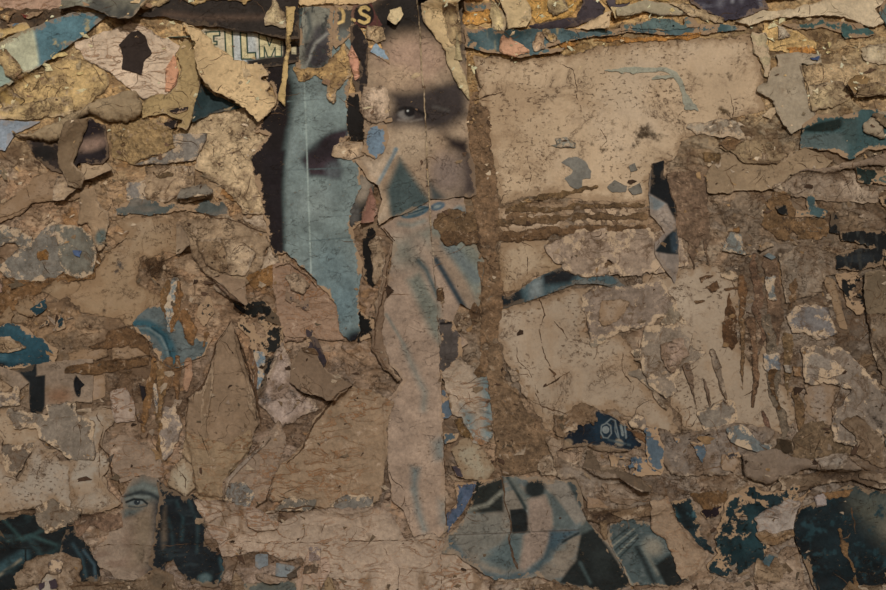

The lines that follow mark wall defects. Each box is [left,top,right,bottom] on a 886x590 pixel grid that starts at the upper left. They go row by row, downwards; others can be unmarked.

peeling [59,0,170,19]
peeling [182,0,296,122]
peeling [365,7,403,44]
peeling [421,0,768,293]
peeling [0,90,190,327]
flaking render [0,372,122,515]
peeling [185,320,262,445]
peeling [289,336,352,401]
flaking render [451,438,496,481]
crack [516,298,569,414]
peeling [498,264,837,434]
peeling [741,448,861,485]